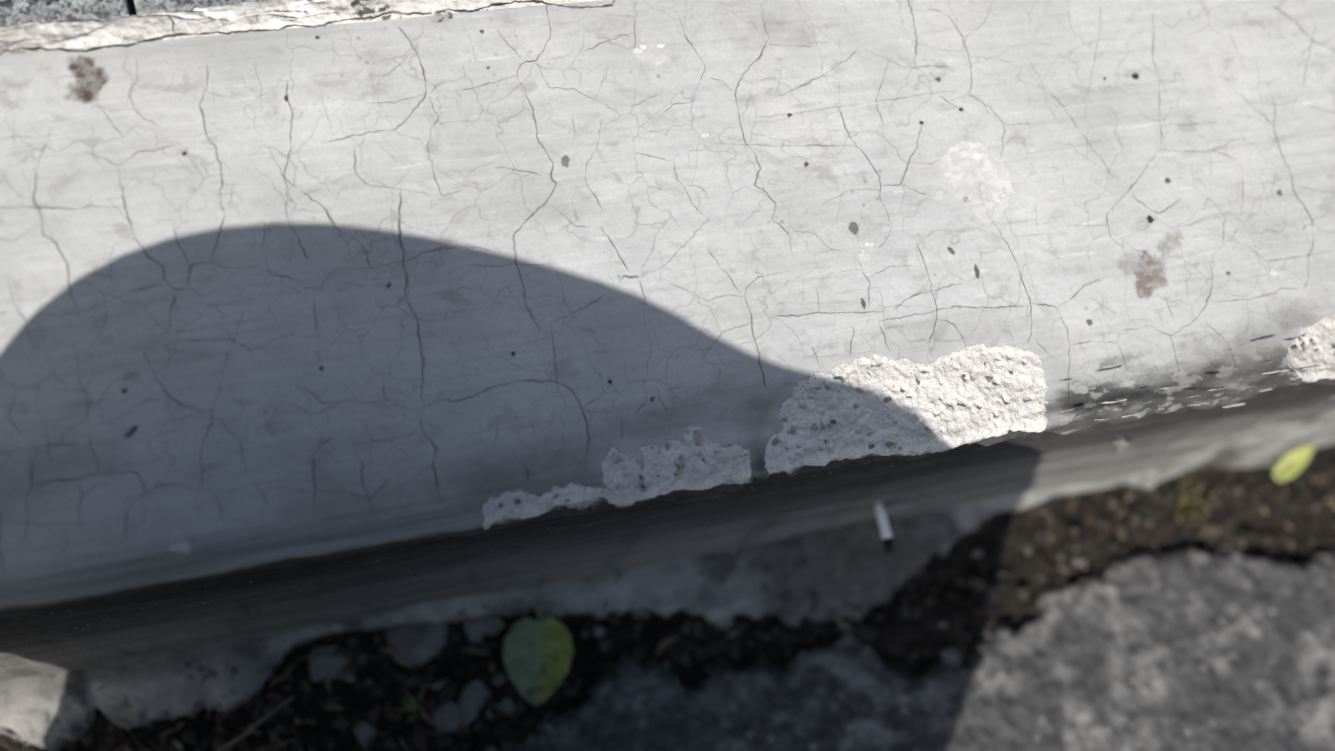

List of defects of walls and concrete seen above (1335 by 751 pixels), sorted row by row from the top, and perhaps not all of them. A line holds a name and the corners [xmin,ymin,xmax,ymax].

crack [0,0,611,55]
corrosion [69,59,105,100]
spalling [1260,314,1335,391]
spalling [1188,379,1246,408]
spalling [479,342,1175,534]